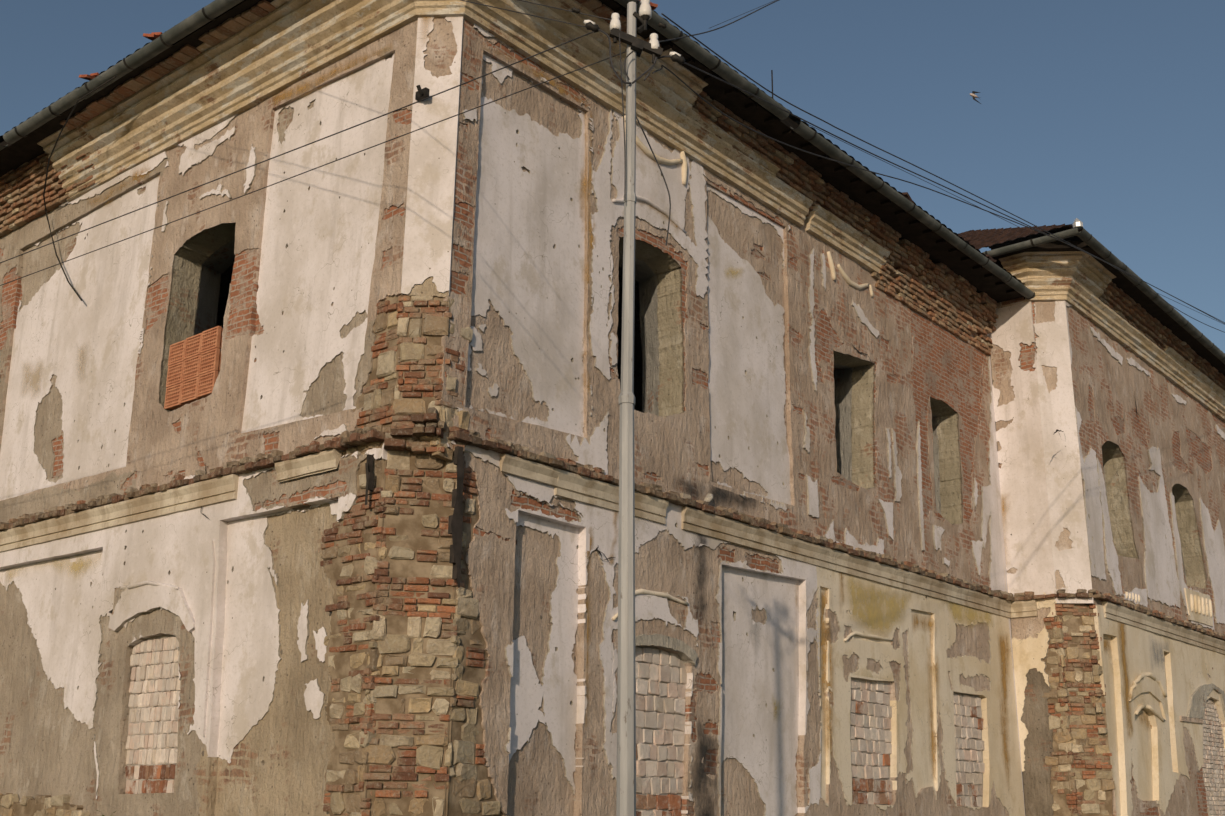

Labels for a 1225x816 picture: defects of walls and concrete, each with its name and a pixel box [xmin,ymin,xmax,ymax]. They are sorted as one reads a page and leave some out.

flaking render [576,0,627,33]
spalling [0,0,619,816]
leakage [694,733,713,816]
spalling [582,90,1225,816]